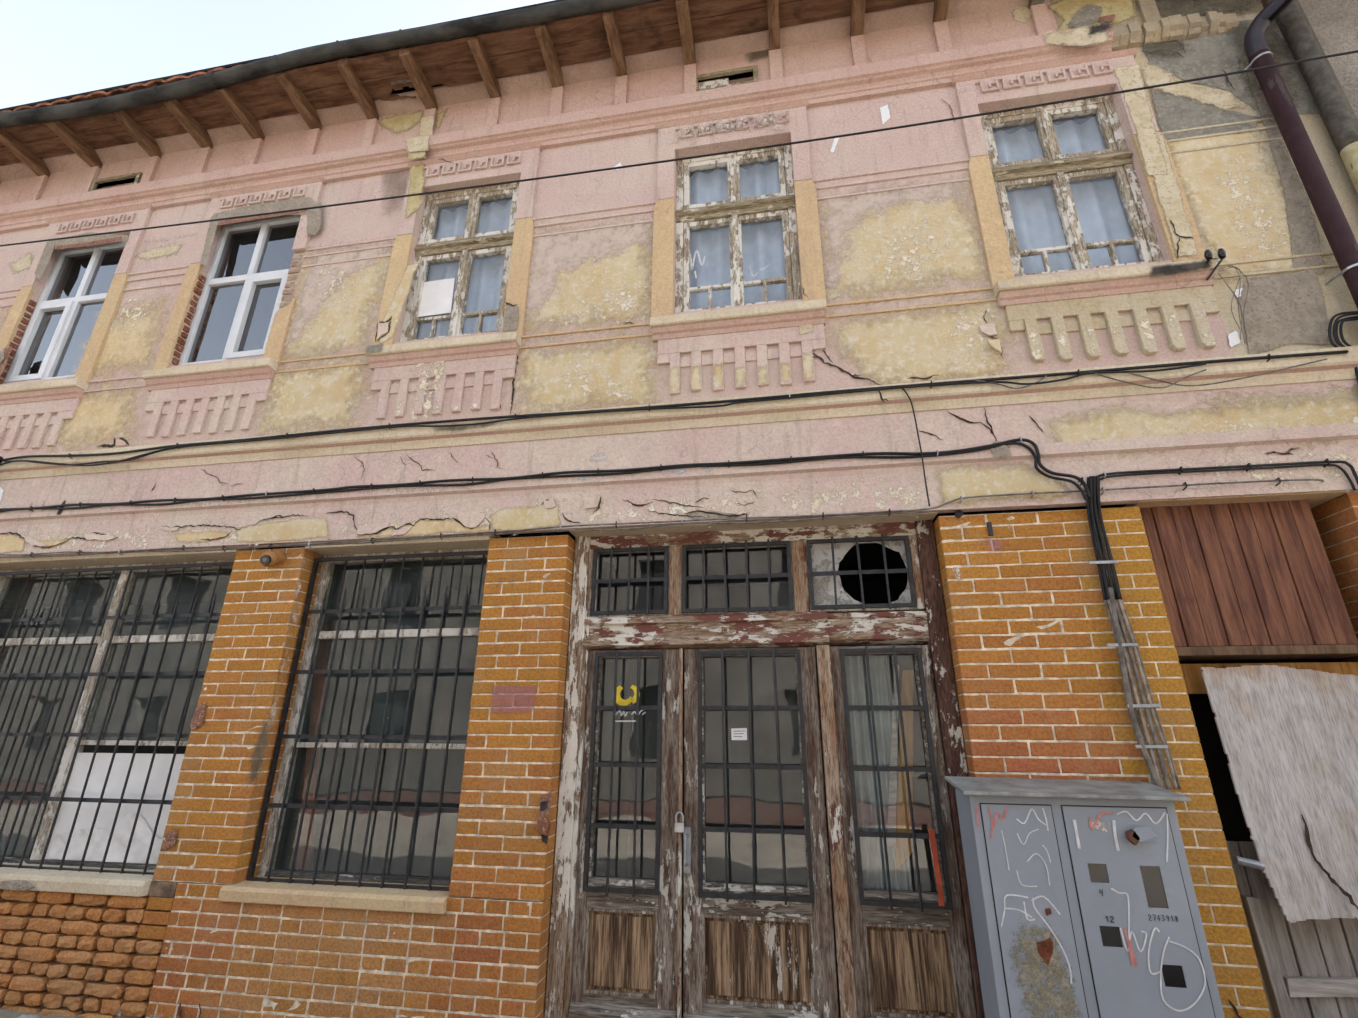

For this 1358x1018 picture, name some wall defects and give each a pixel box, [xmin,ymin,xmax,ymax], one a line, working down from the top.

flaking render [1043,0,1136,46]
peeling [1113,6,1338,355]
flaking render [0,299,37,384]
peeling [10,197,418,450]
peeling [503,217,814,415]
peeling [819,181,1012,385]
peeling [1028,329,1044,359]
peeling [0,464,1067,563]